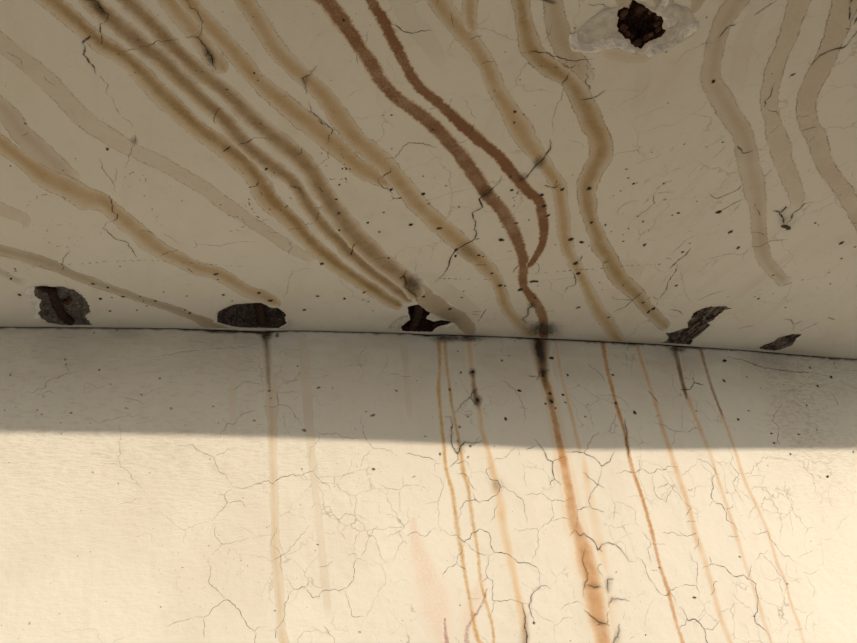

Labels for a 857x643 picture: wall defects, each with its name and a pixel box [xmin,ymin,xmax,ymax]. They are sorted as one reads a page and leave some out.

spalling [26,284,93,327]
spalling [213,302,289,329]
water stain [0,0,539,643]
corrosion [312,0,628,643]
crack [149,306,853,373]
water stain [388,0,670,342]
spalling [661,305,733,346]
water stain [699,0,857,287]
crack [754,203,806,230]
crack [443,392,765,643]
corrosion [599,342,686,643]
corrosion [671,347,807,643]